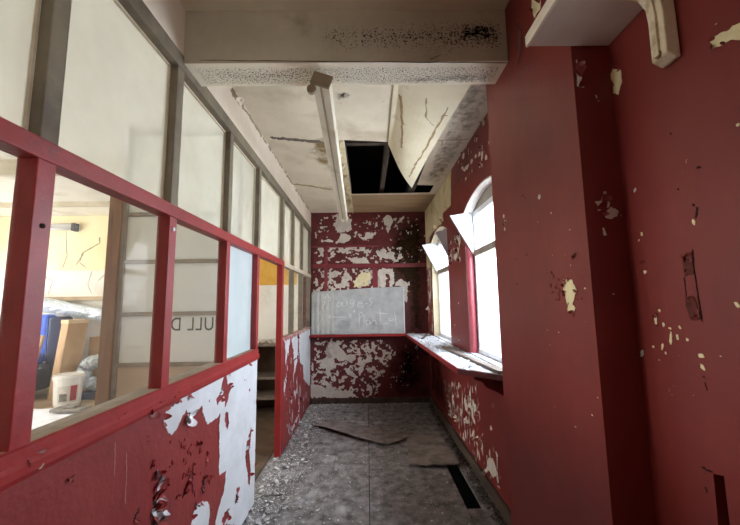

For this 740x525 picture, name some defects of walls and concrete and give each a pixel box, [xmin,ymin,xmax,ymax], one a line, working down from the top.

damp [325,19,501,52]
peeling [708,23,740,50]
damp [195,66,498,91]
peeling [610,69,622,95]
crack [397,95,405,148]
crack [409,98,468,177]
flaking render [313,135,489,332]
peeling [561,279,586,314]
spalling [640,309,689,361]
peeling [284,329,418,435]
peeling [150,360,257,525]
peeling [444,380,501,488]